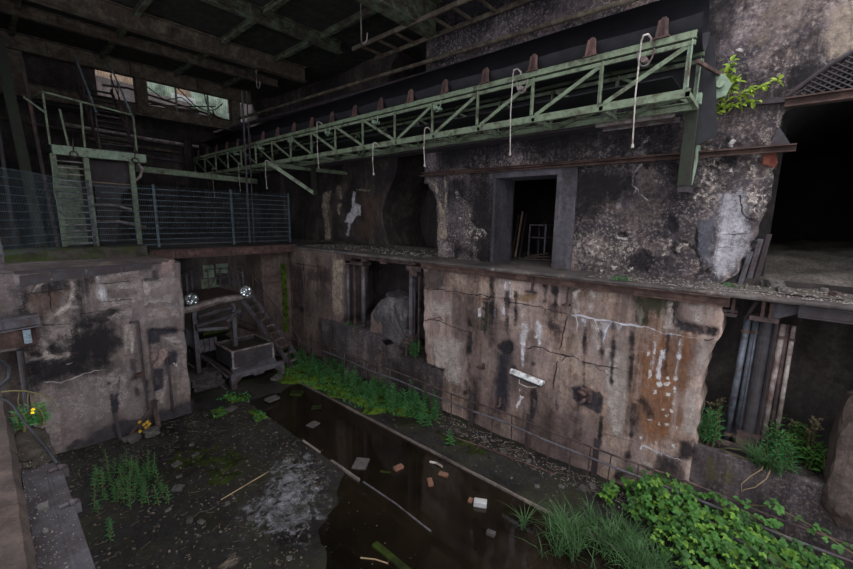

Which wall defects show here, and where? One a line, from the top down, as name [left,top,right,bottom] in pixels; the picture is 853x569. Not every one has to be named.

damp [344,191,361,236]
spalling [661,215,689,256]
damp [88,308,118,323]
damp [26,327,193,451]
crack [424,317,469,337]
damp [434,278,561,419]
damp [572,289,652,443]
rust [635,337,689,444]